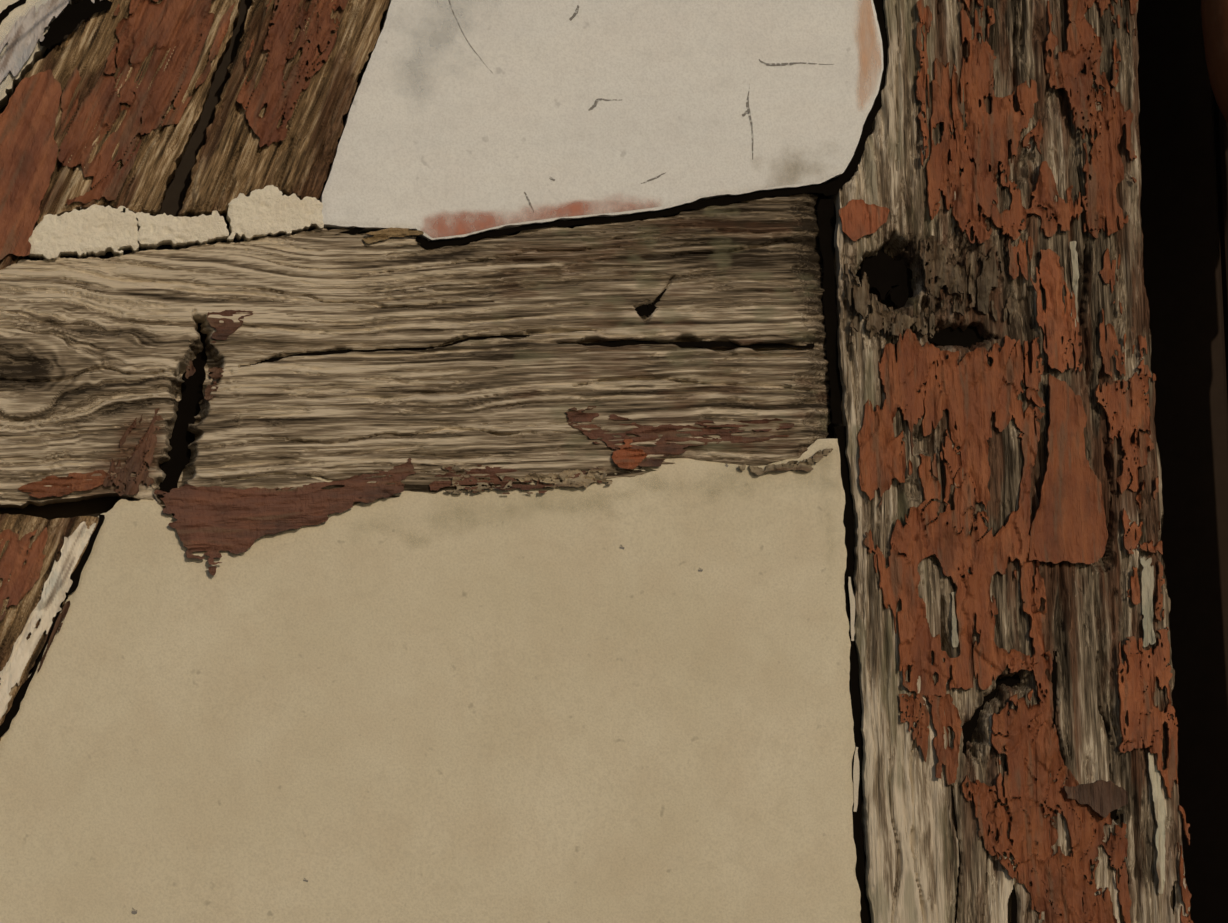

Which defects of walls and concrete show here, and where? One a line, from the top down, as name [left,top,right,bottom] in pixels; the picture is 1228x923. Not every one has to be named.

peeling [0,0,235,260]
peeling [236,0,348,147]
peeling [18,408,416,576]
crack [158,0,913,923]
peeling [429,406,794,494]
peeling [857,0,1193,923]
peeling [0,521,96,719]
crack [962,676,1021,755]
crack [1050,651,1058,736]
crack [951,784,961,923]
crack [1010,885,1018,923]
crack [1170,883,1178,914]